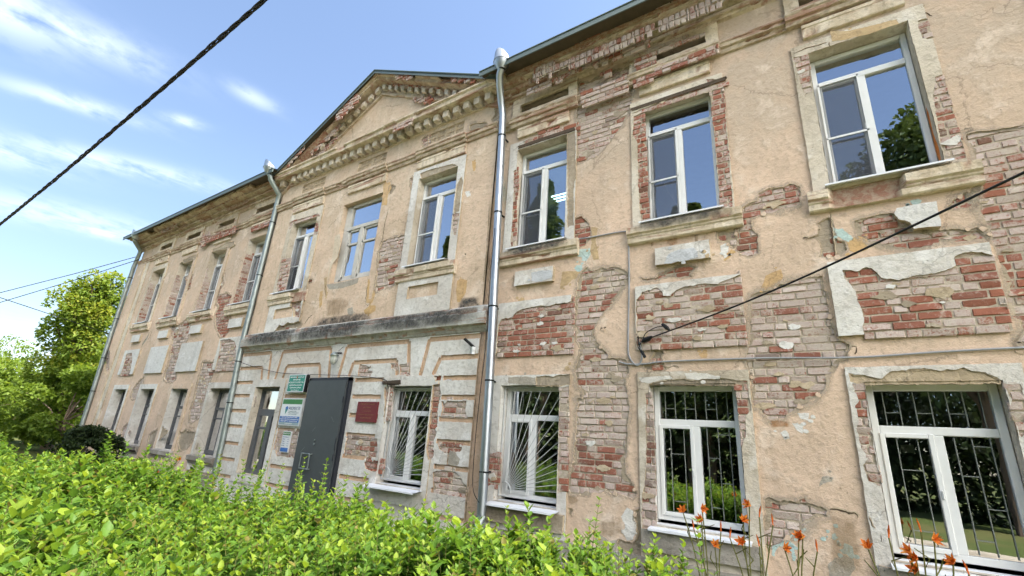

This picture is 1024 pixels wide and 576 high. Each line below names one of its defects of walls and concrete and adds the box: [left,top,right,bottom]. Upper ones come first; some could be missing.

flaking render [918,16,933,39]
flaking render [308,234,405,316]
flaking render [497,67,1024,555]
flaking render [146,276,236,458]
flaking render [345,435,386,474]
flaking render [764,496,860,576]